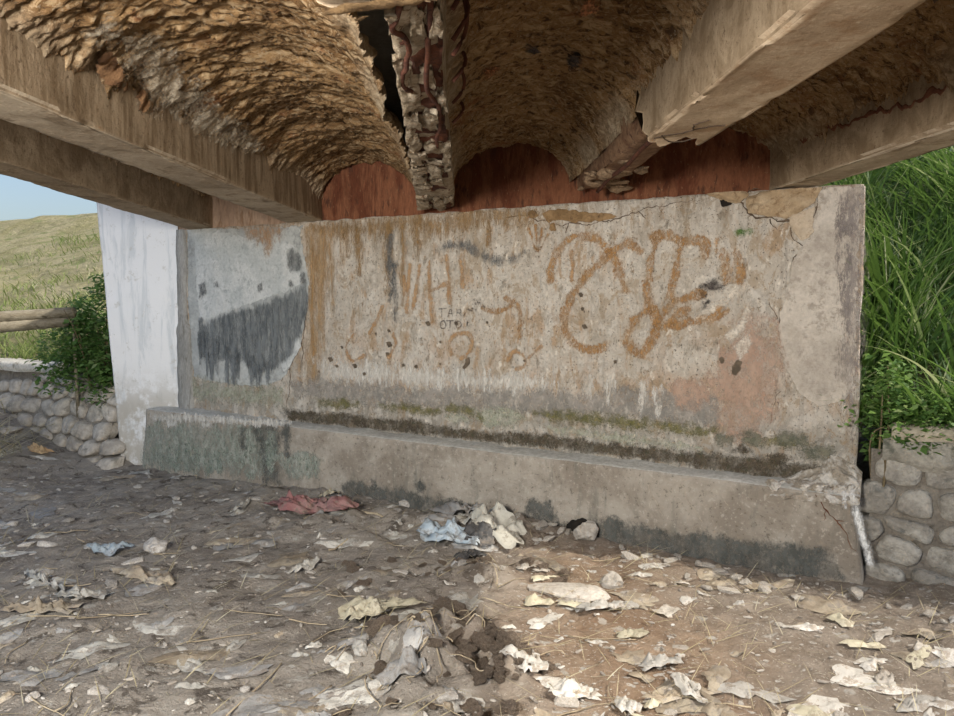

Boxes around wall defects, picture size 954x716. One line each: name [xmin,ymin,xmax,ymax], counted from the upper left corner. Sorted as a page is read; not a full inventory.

spalling [321,0,470,211]
crack [654,119,726,143]
crack [800,85,948,144]
spalling [577,141,652,194]
peeling [187,225,310,387]
water stain [836,193,866,413]
water stain [291,356,836,461]
water stain [240,418,291,485]
spalling [765,455,862,506]